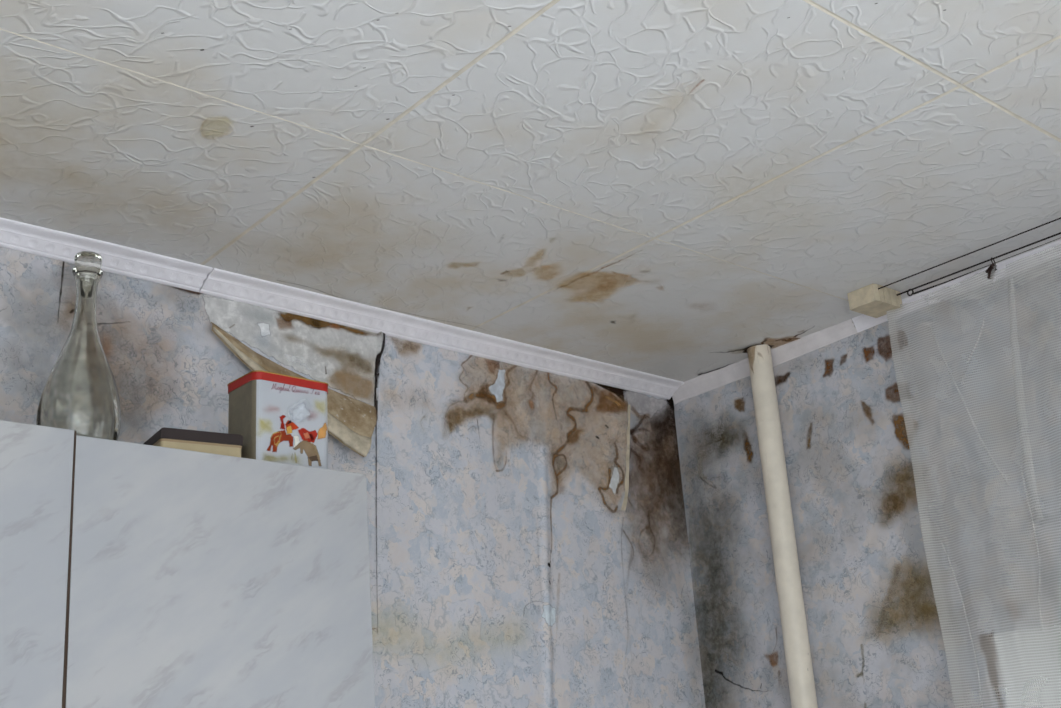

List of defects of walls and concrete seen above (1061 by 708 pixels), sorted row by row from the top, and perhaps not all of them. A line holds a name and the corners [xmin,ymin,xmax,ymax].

leakage [500,251,631,301]
flaking render [202,295,383,406]
leakage [884,463,923,520]
leakage [447,355,741,708]
leakage [877,567,942,632]